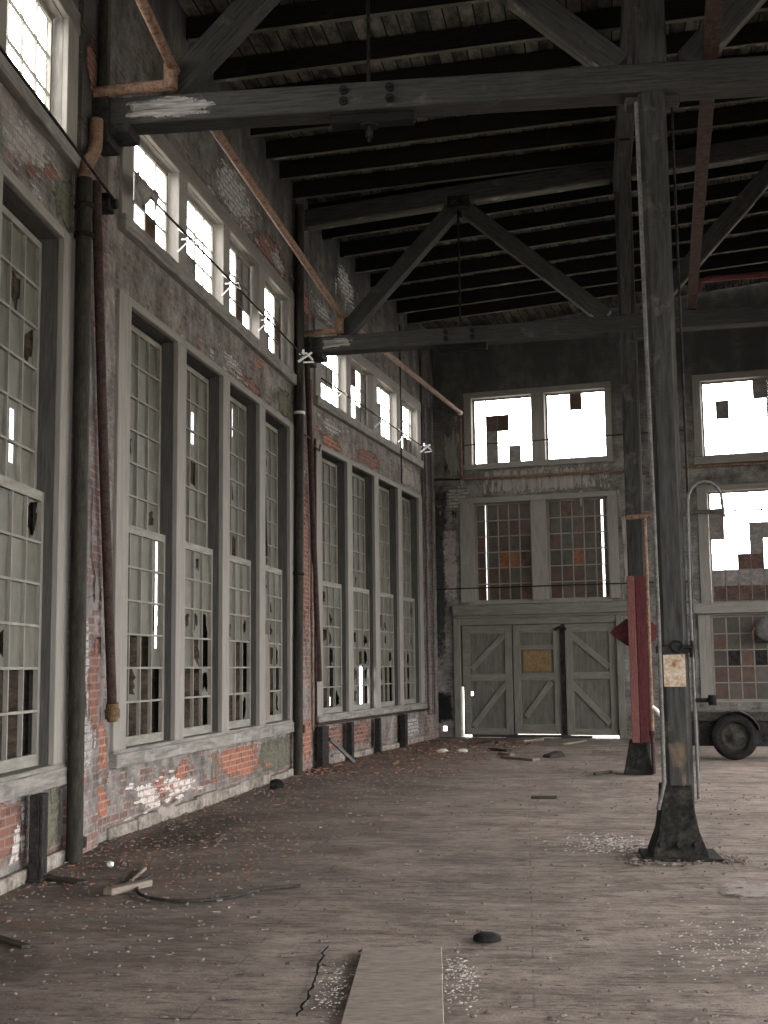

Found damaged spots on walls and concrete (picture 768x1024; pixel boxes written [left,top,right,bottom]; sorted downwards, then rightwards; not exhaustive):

flaking render [125,740,271,814]
flaking render [0,801,27,859]
crack [296,946,332,1017]